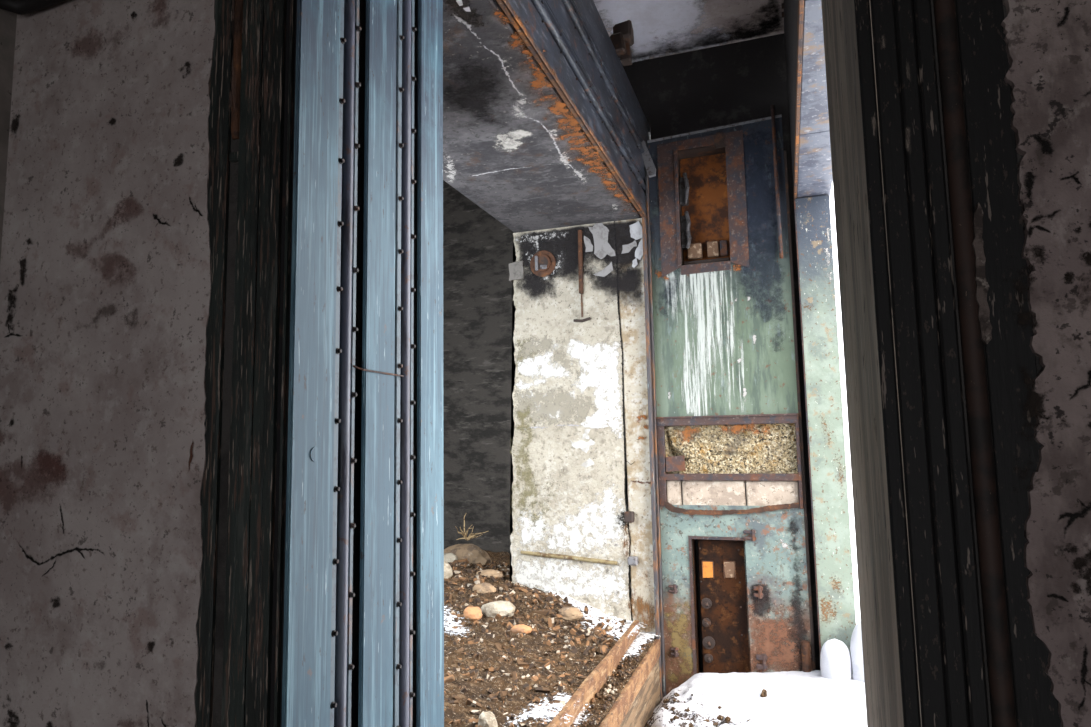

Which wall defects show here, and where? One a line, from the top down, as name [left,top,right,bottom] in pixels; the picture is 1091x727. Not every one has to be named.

crack [1057,7,1070,27]
peeling [493,94,533,152]
rust [494,10,637,212]
crack [1024,135,1081,237]
peeling [584,221,643,277]
peeling [514,335,623,467]
crack [1070,370,1091,399]
crack [19,506,100,576]
spalling [513,484,628,604]
crack [1059,501,1091,537]
rust [748,602,802,673]